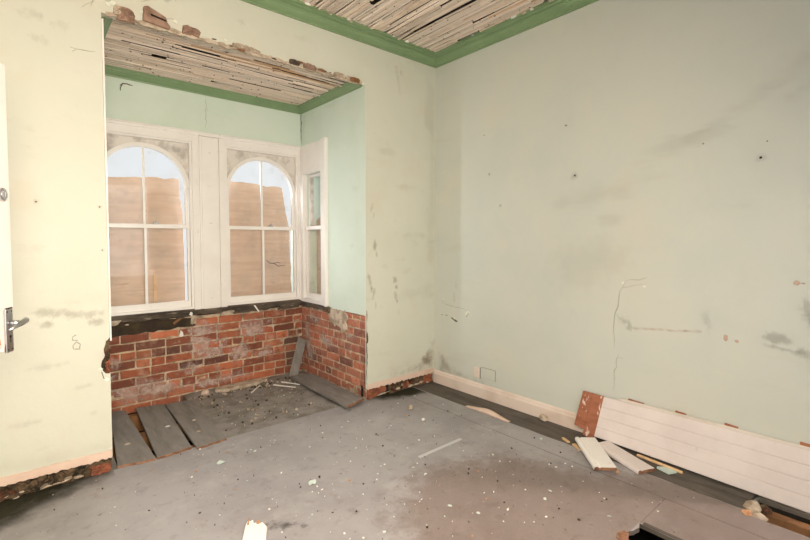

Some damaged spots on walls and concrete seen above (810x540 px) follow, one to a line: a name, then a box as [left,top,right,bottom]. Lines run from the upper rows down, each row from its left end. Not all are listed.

spalling [105,0,365,86]
spalling [361,310,434,400]
spalling [0,449,112,502]